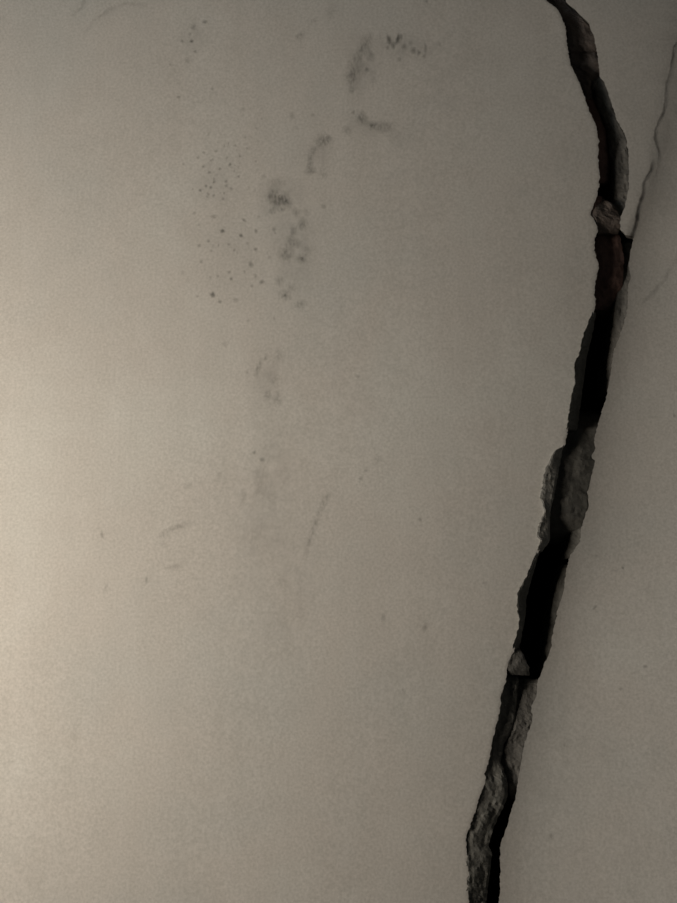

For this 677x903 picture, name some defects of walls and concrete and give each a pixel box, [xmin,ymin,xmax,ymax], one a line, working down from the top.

crack [466,0,651,903]